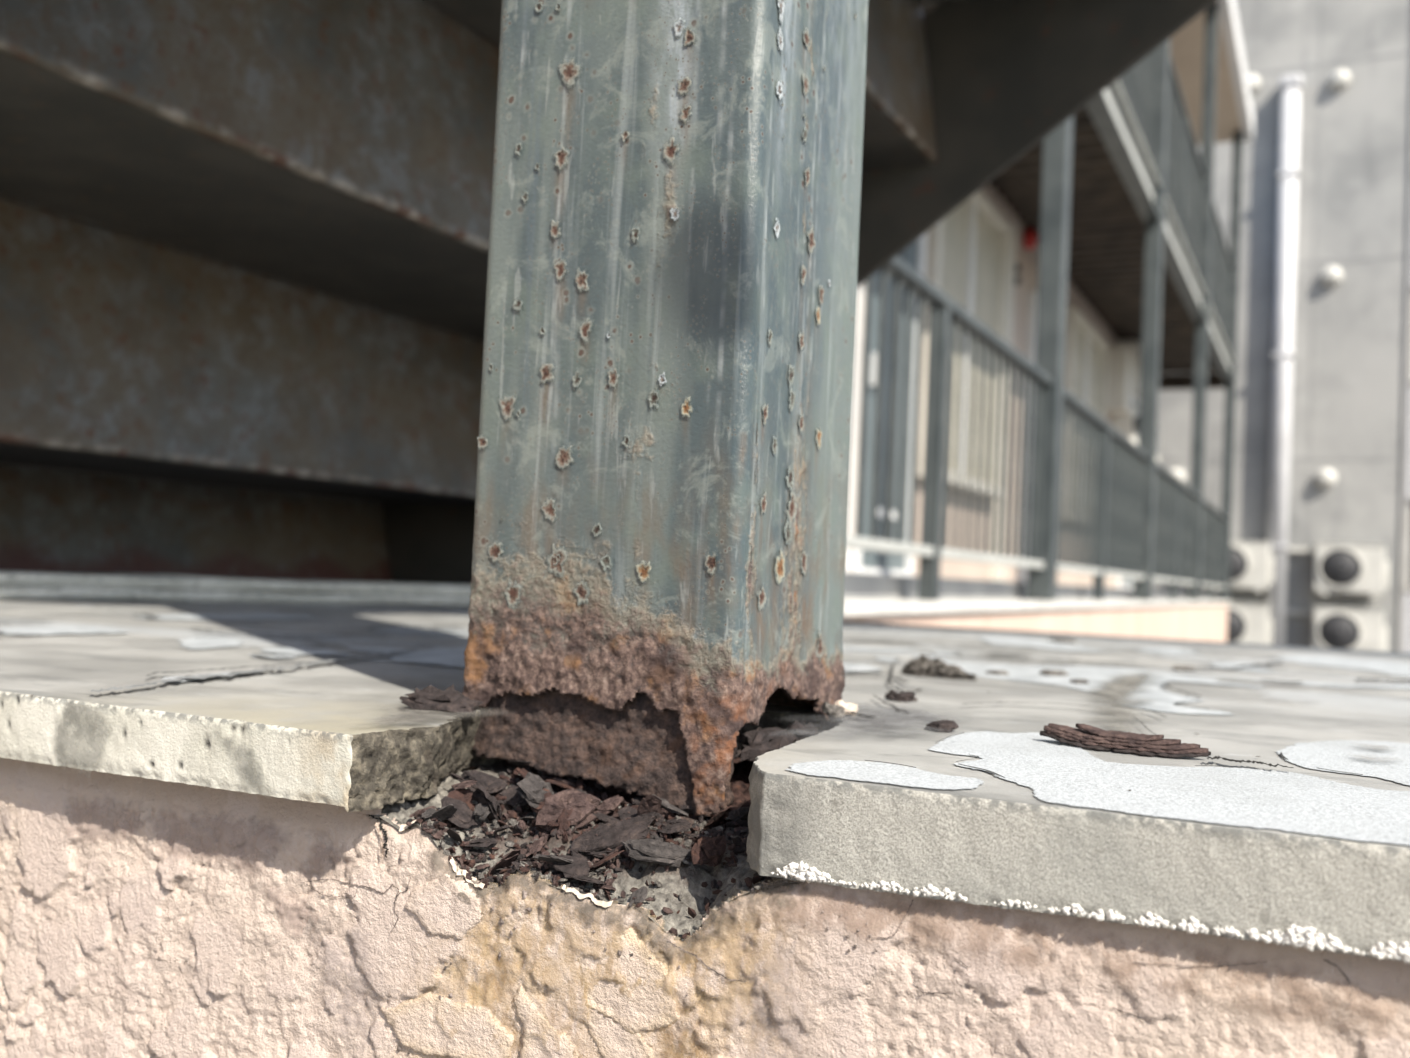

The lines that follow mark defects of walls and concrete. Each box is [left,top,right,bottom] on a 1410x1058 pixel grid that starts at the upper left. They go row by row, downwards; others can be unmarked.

rust [777,0,785,53]
rust [662,75,692,166]
rust [681,396,693,418]
rust [757,465,807,611]
rust [735,700,858,762]
rust [472,785,502,821]
rust [515,772,601,833]
peeling [785,731,1410,845]
crack [300,814,411,934]
spalling [358,758,799,941]
efflorescence [771,861,967,902]
efflorescence [986,899,1410,964]